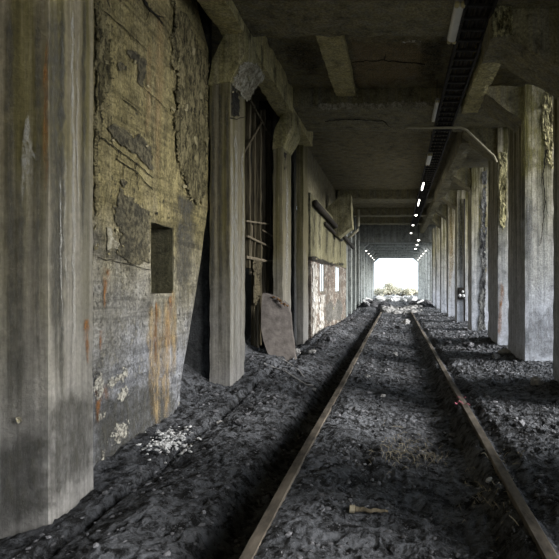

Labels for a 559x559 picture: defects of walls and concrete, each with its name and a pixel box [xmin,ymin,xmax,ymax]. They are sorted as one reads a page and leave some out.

damp [50,19,73,361]
spalling [93,0,154,231]
crack [101,137,153,190]
peeling [107,179,151,265]
spalling [231,62,265,117]
spalling [477,168,488,331]
damp [0,366,174,521]